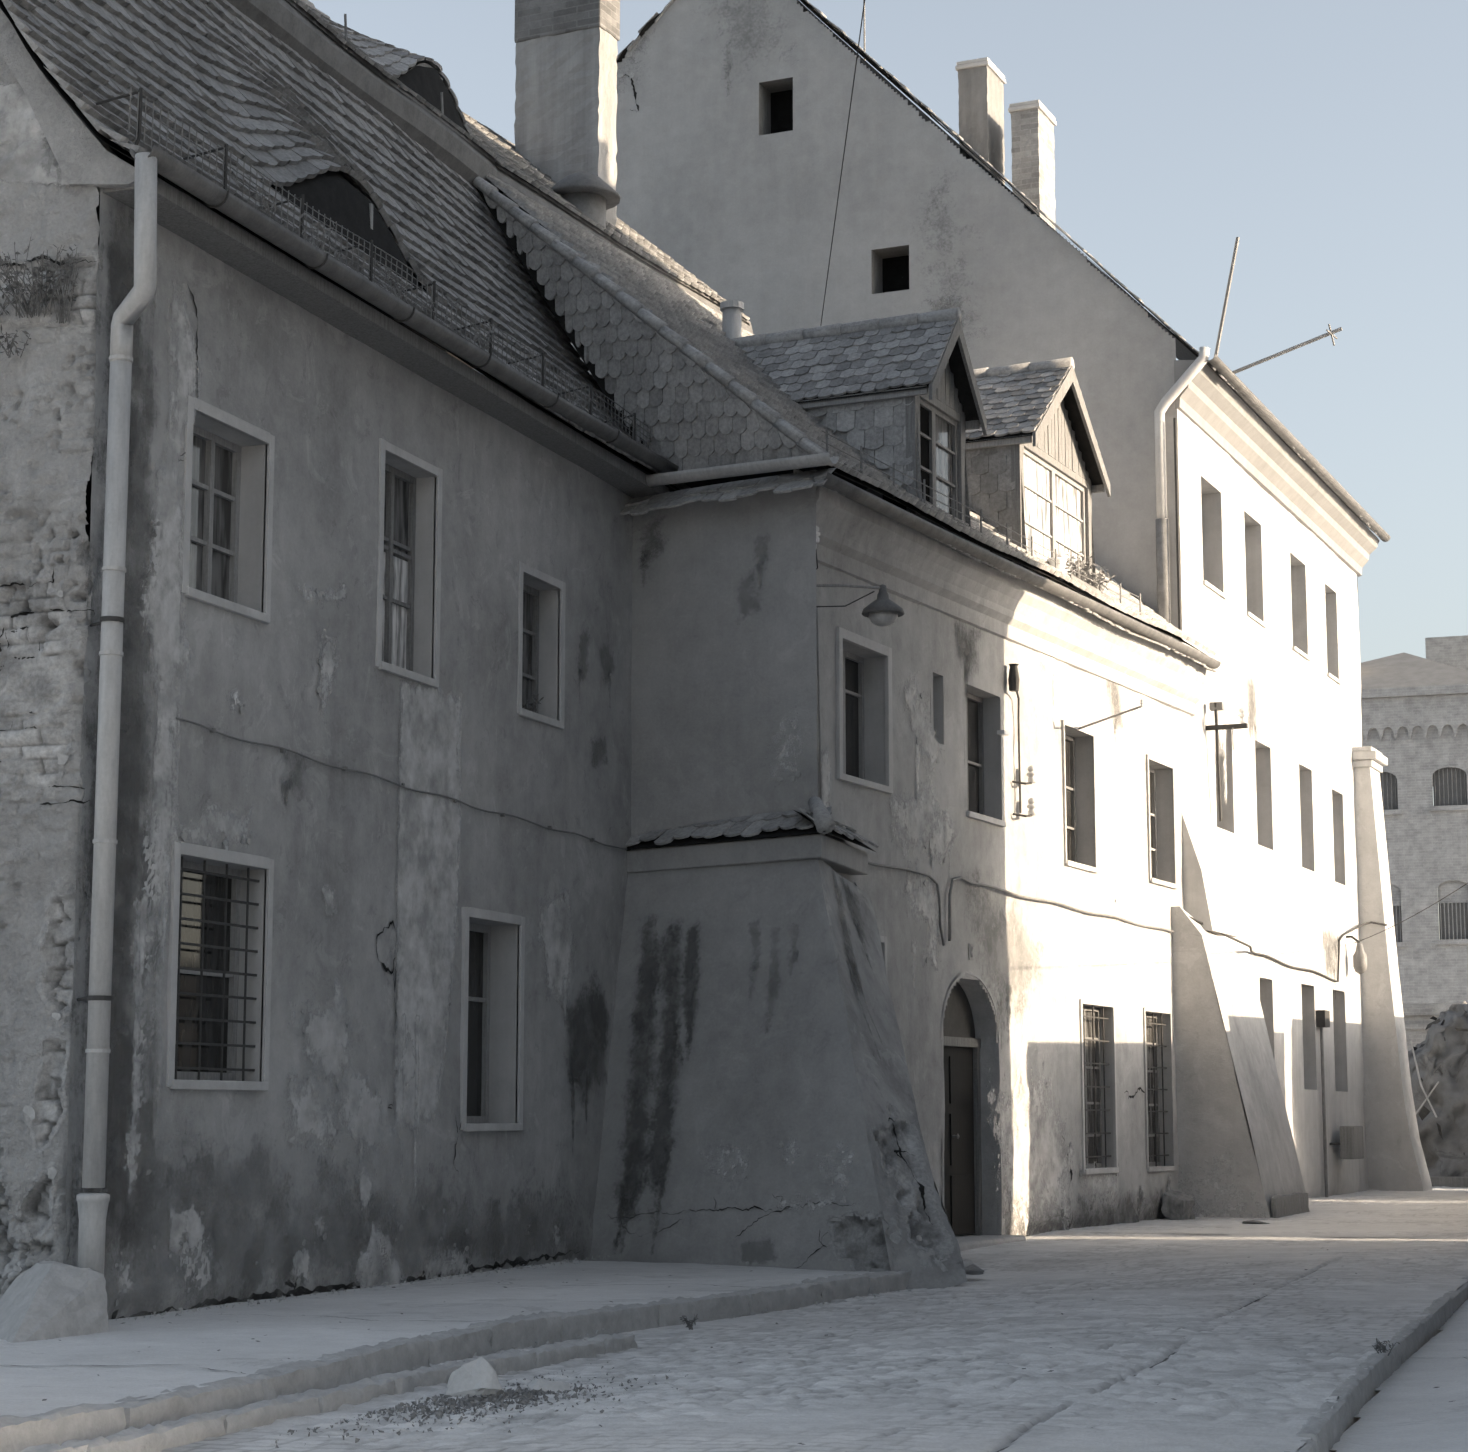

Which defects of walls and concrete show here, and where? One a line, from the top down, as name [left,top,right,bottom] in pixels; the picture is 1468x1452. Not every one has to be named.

crack [0,255,96,267]
flaking render [0,564,77,806]
crack [0,569,95,671]
crack [41,785,90,805]
spalling [0,889,89,1299]
leakage [567,984,608,1125]
leakage [615,921,699,1244]
crack [111,1252,579,1319]
crack [609,1194,864,1269]
spalling [825,1101,955,1272]